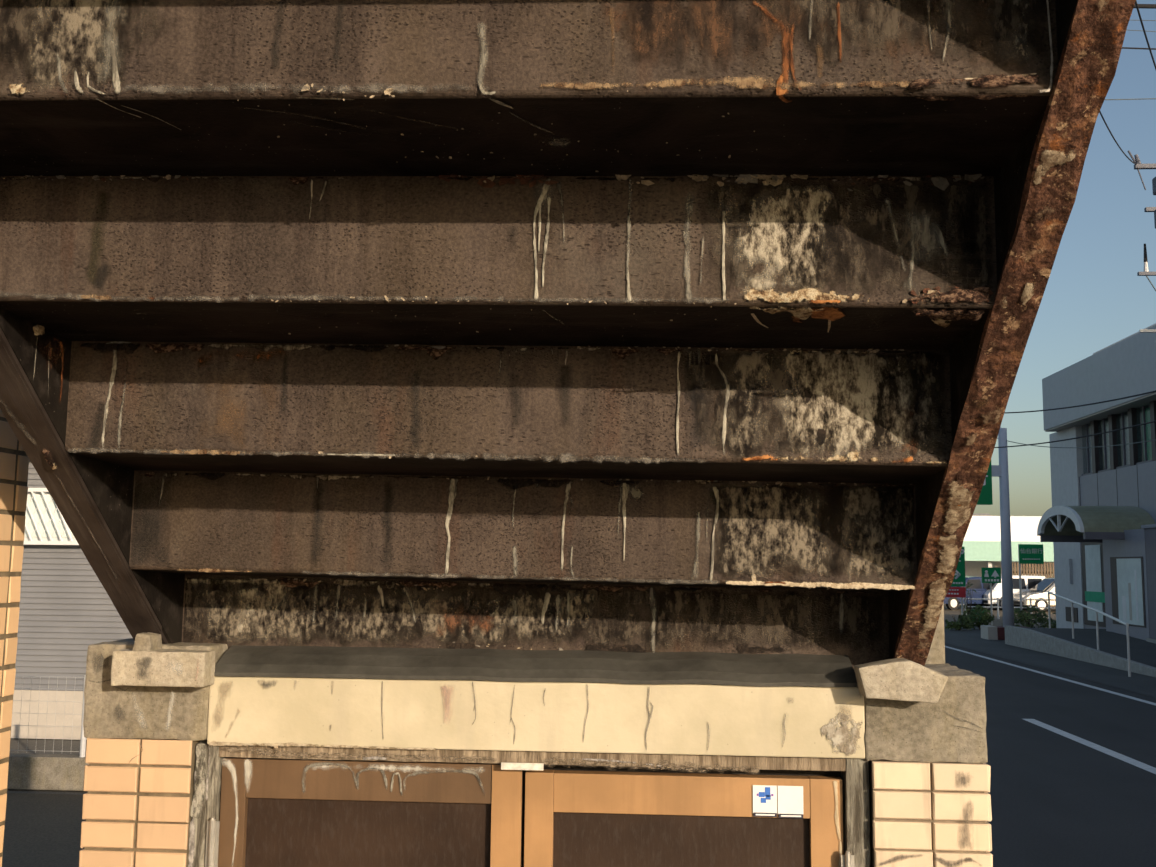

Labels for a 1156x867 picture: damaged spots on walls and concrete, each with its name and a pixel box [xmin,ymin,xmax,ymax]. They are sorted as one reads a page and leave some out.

peeling [0,0,59,79]
damp [9,0,181,130]
peeling [98,0,158,77]
corrosion [753,1,800,103]
corrosion [909,73,1039,101]
damp [533,178,564,300]
corrosion [902,286,994,327]
damp [445,479,458,574]
damp [561,481,574,577]
damp [693,486,719,581]
crack [645,687,653,750]
flaking render [821,708,862,756]